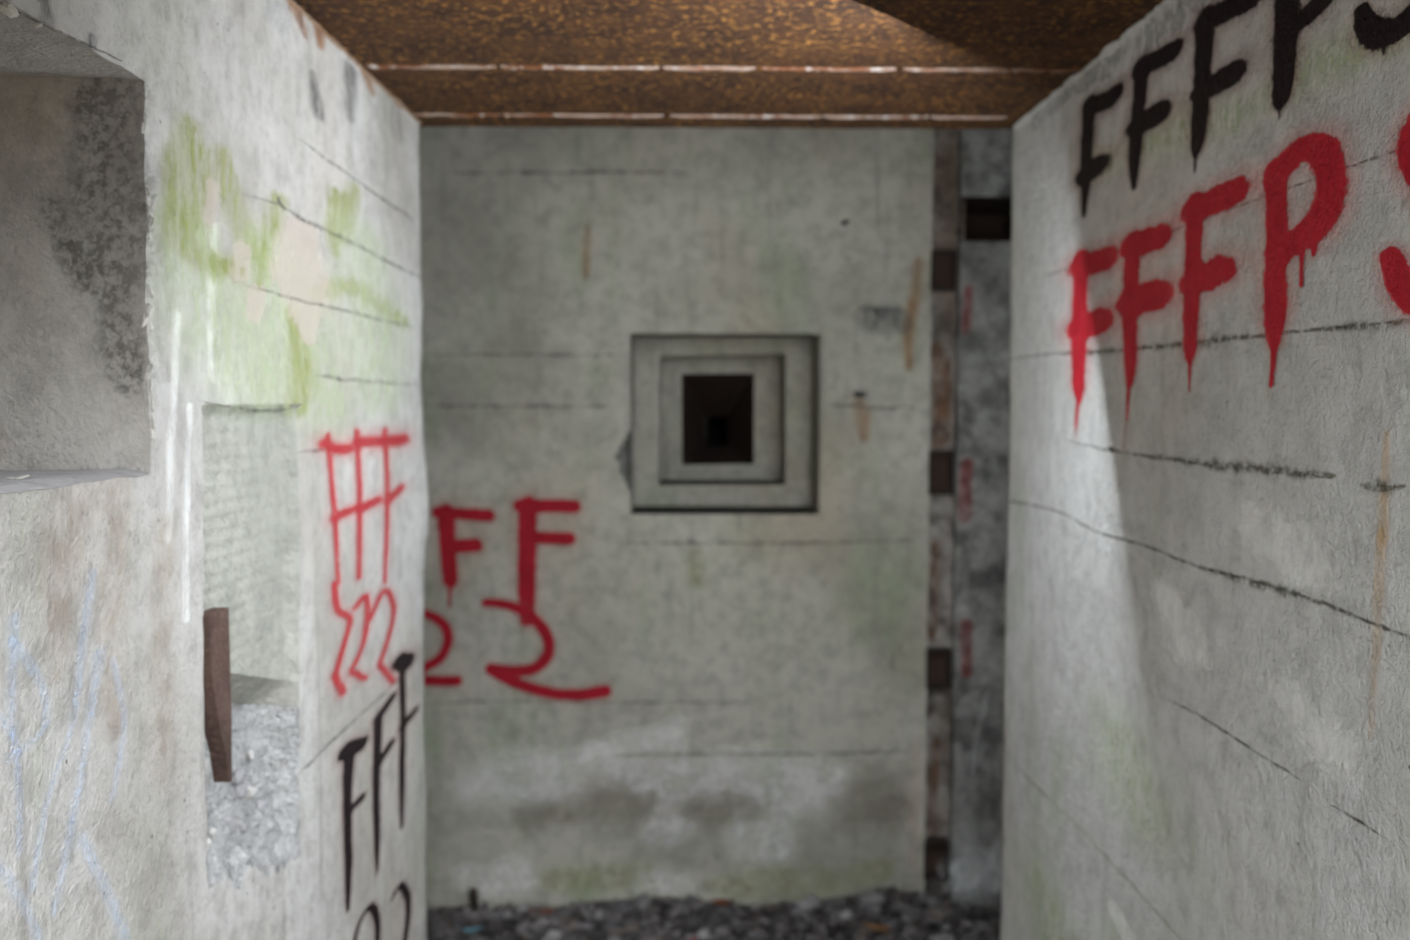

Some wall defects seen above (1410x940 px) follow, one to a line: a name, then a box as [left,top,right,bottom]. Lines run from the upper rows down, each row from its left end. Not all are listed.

leakage [46,77,282,391]
leakage [290,312,310,414]
spalling [204,703,301,940]